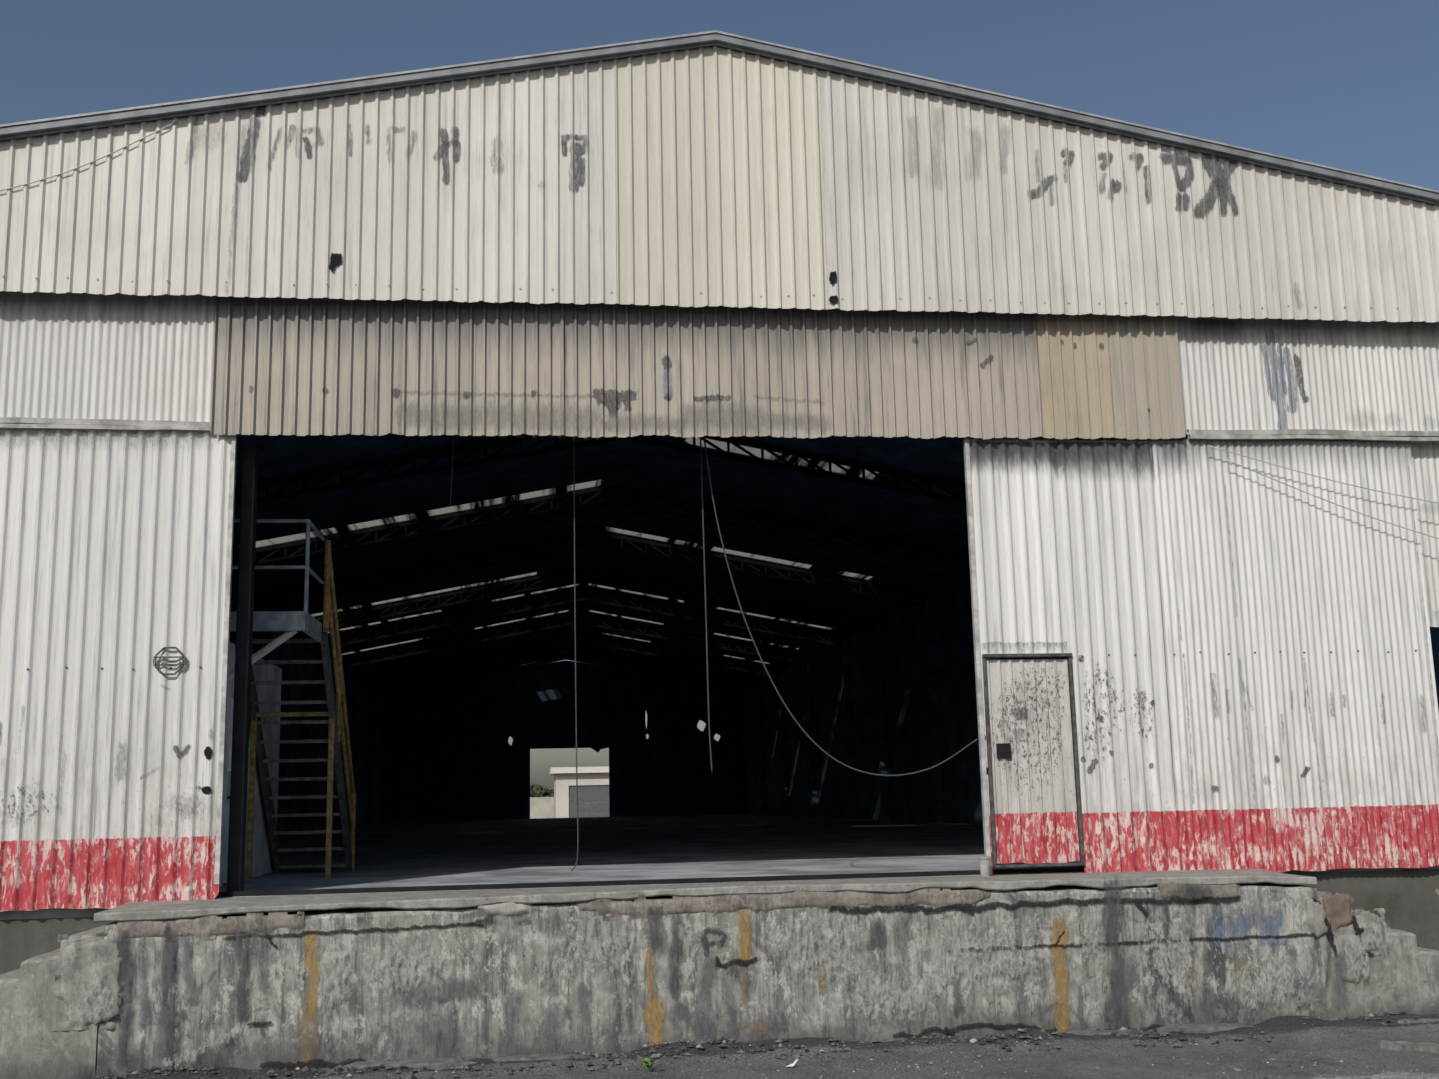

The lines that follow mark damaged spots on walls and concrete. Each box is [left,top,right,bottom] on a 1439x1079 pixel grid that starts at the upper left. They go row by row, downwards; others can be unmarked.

leakage [647,910,774,1042]
leakage [866,920,909,985]
leakage [946,947,964,1016]
spalling [1302,892,1392,992]